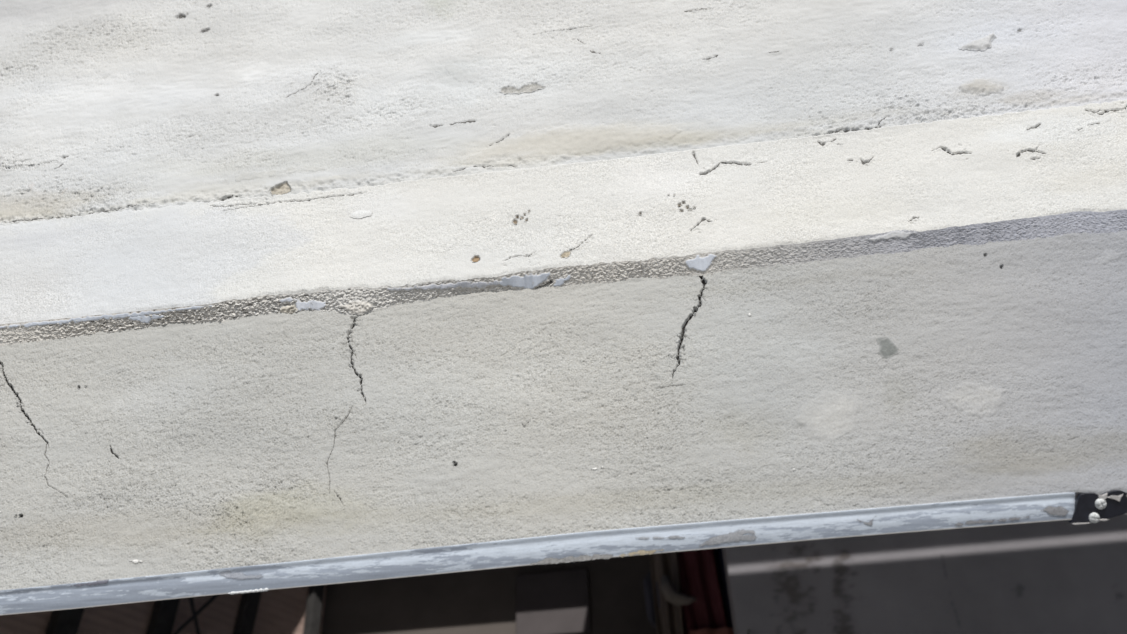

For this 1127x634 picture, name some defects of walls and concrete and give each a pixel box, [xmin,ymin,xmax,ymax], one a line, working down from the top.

crack [659,276,708,388]
crack [0,360,68,498]
crack [327,317,366,501]